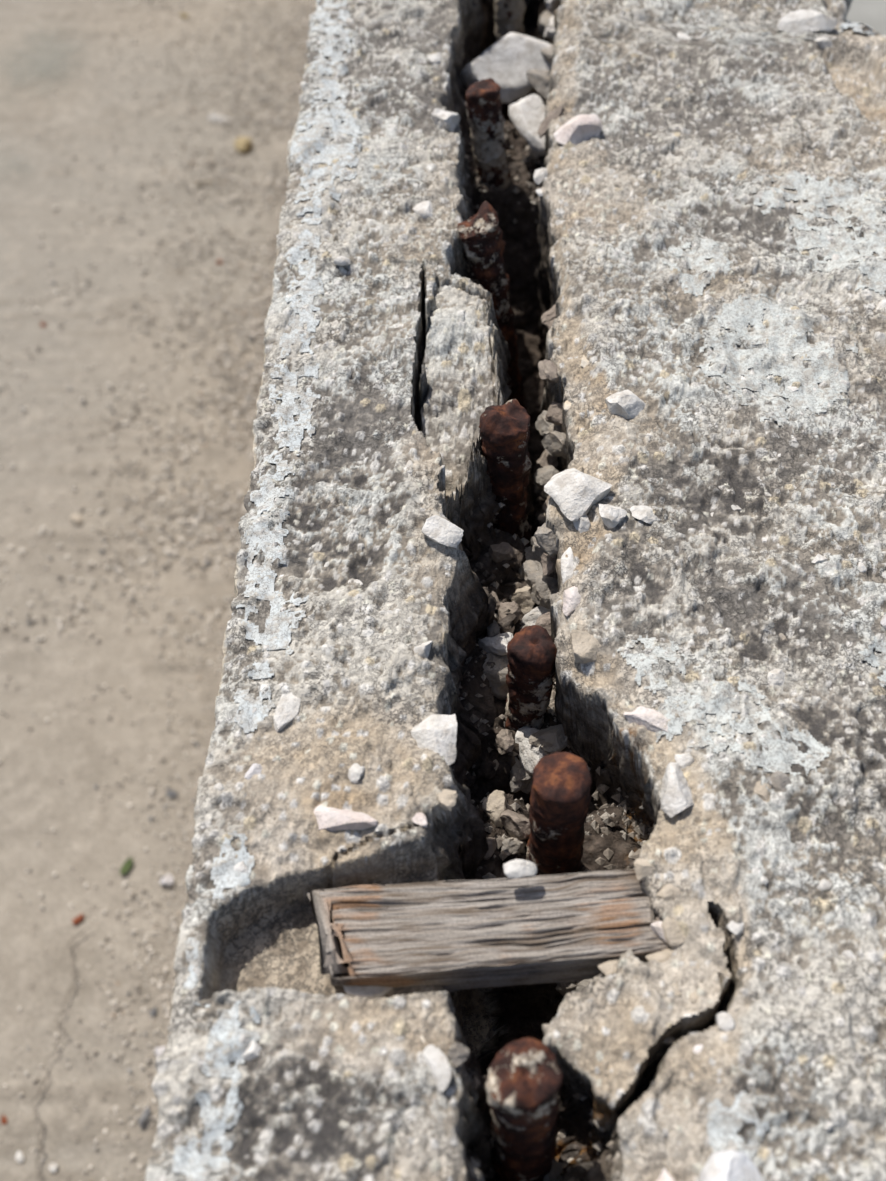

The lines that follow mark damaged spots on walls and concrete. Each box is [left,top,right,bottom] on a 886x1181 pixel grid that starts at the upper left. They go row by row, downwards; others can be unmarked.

spalling [492,0,525,44]
spalling [466,78,522,191]
peeling [662,235,733,296]
peeling [752,170,886,294]
spalling [457,201,532,545]
spalling [210,0,435,900]
crack [325,0,661,889]
spalling [504,625,557,731]
spalling [526,752,592,876]
spalling [172,937,455,1181]
crack [450,901,746,1181]